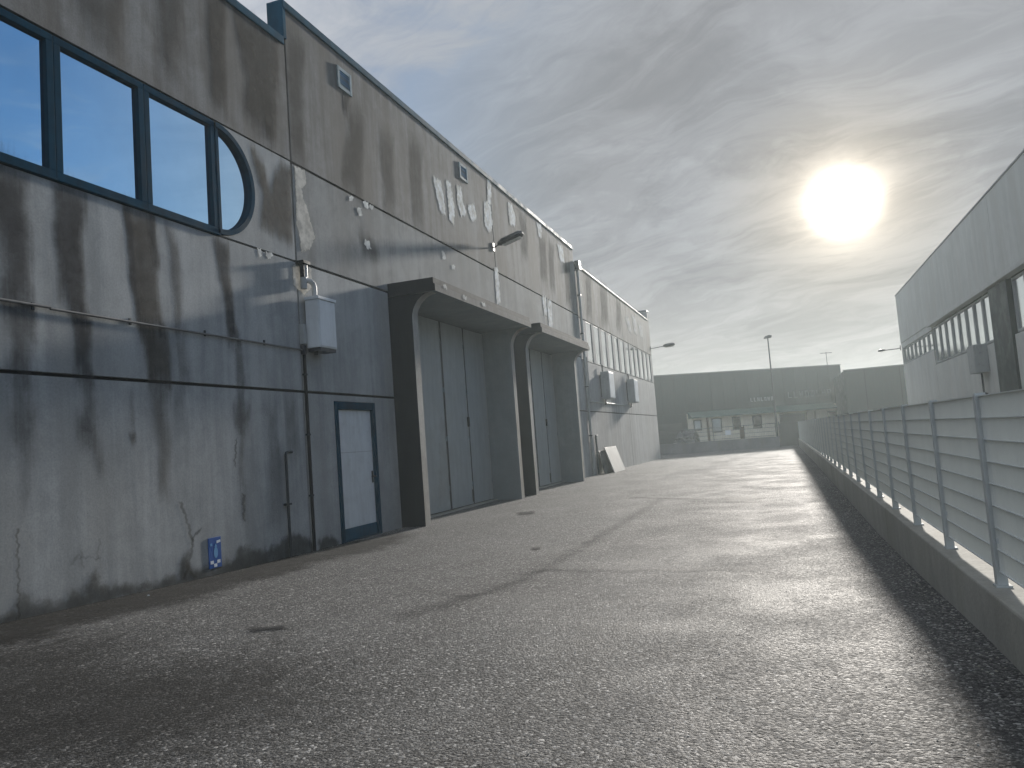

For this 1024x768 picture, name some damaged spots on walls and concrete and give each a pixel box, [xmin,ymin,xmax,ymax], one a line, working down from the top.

damp [209,1,278,135]
damp [0,169,28,359]
damp [56,188,91,370]
damp [125,212,170,386]
damp [215,239,236,337]
damp [252,151,292,241]
peeling [293,265,312,295]
peeling [294,166,315,252]